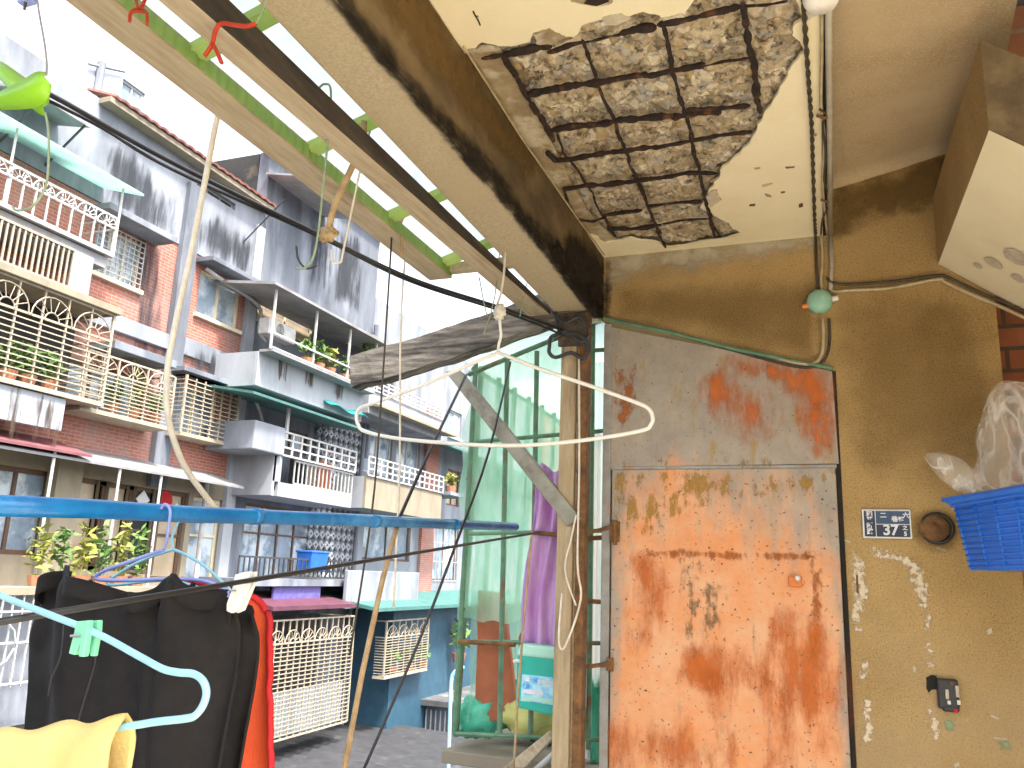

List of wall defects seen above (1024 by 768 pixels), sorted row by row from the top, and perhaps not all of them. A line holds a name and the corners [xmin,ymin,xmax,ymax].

spalling [467,0,816,248]
damp [332,0,814,320]
damp [311,236,360,302]
rust [618,373,635,422]
rust [740,364,832,455]
rust [615,472,729,533]
rust [670,550,741,559]
rust [764,552,826,718]
peeling [851,546,937,692]
rust [684,648,731,695]
peeling [863,699,875,742]
peeling [928,709,940,740]